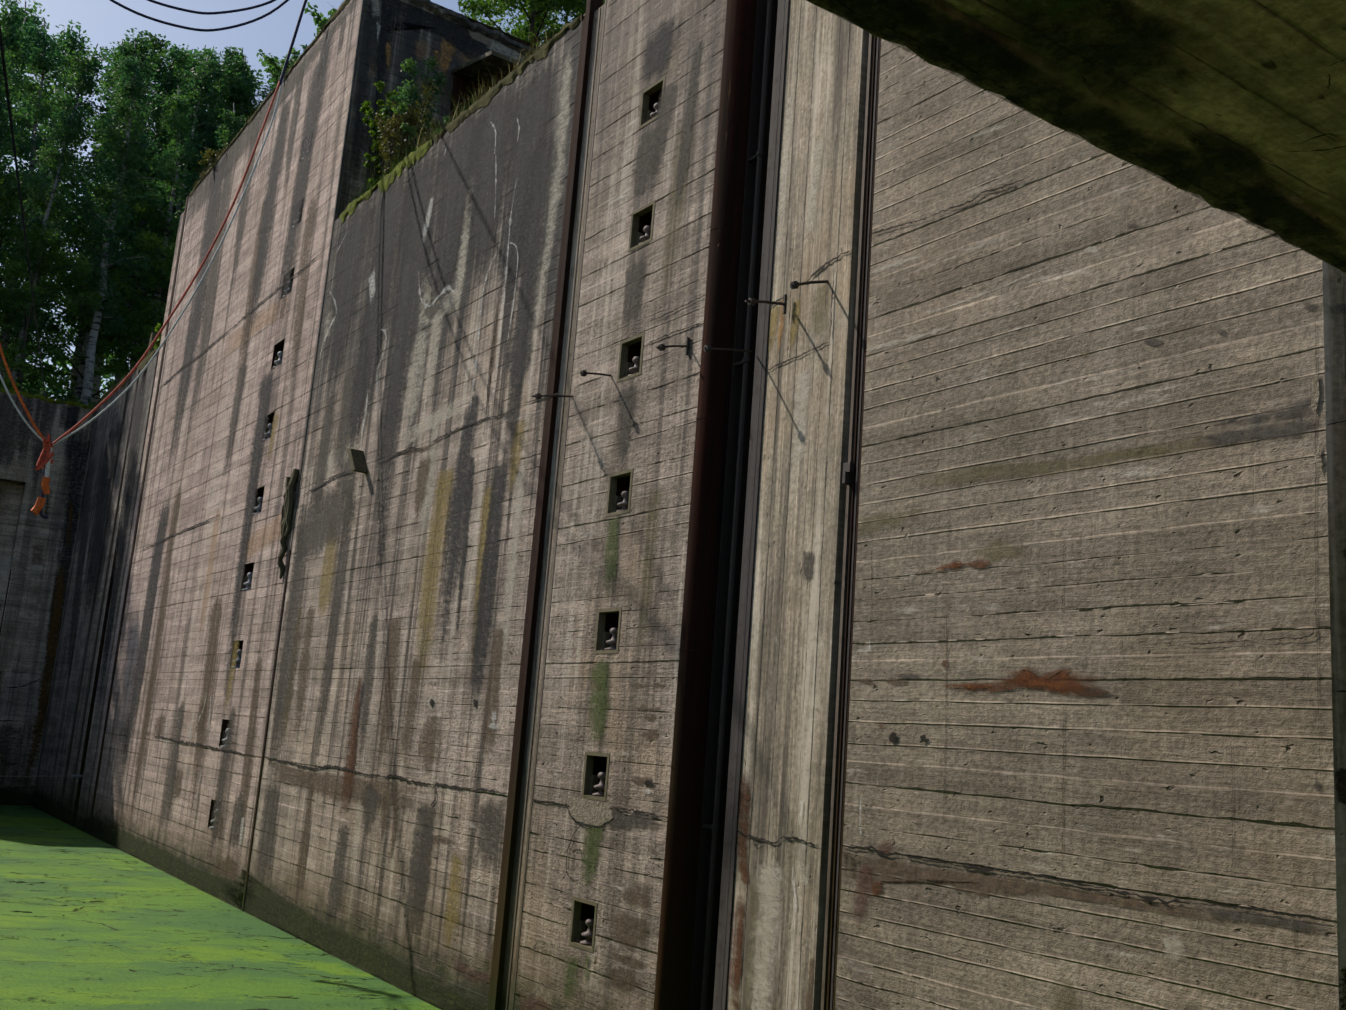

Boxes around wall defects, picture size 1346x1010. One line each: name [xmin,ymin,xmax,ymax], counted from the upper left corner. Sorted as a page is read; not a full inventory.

water stain [353,0,490,174]
water stain [120,0,356,881]
water stain [313,61,571,770]
water stain [0,376,146,785]
crack [143,515,220,550]
rust [916,560,989,574]
water stain [258,497,435,925]
rust [943,668,1113,697]
crack [155,735,582,881]
water stain [477,800,505,863]
crack [612,807,667,818]
spalling [1313,768,1346,805]